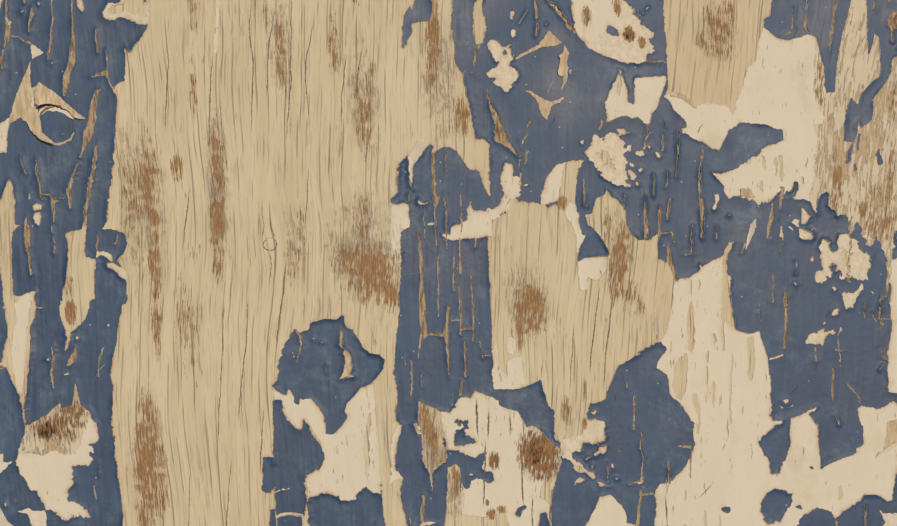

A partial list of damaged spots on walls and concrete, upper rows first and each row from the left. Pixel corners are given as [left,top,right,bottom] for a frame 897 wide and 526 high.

peeling [0,44,85,153]
peeling [0,180,99,526]
peeling [60,0,491,526]
peeling [414,0,897,526]